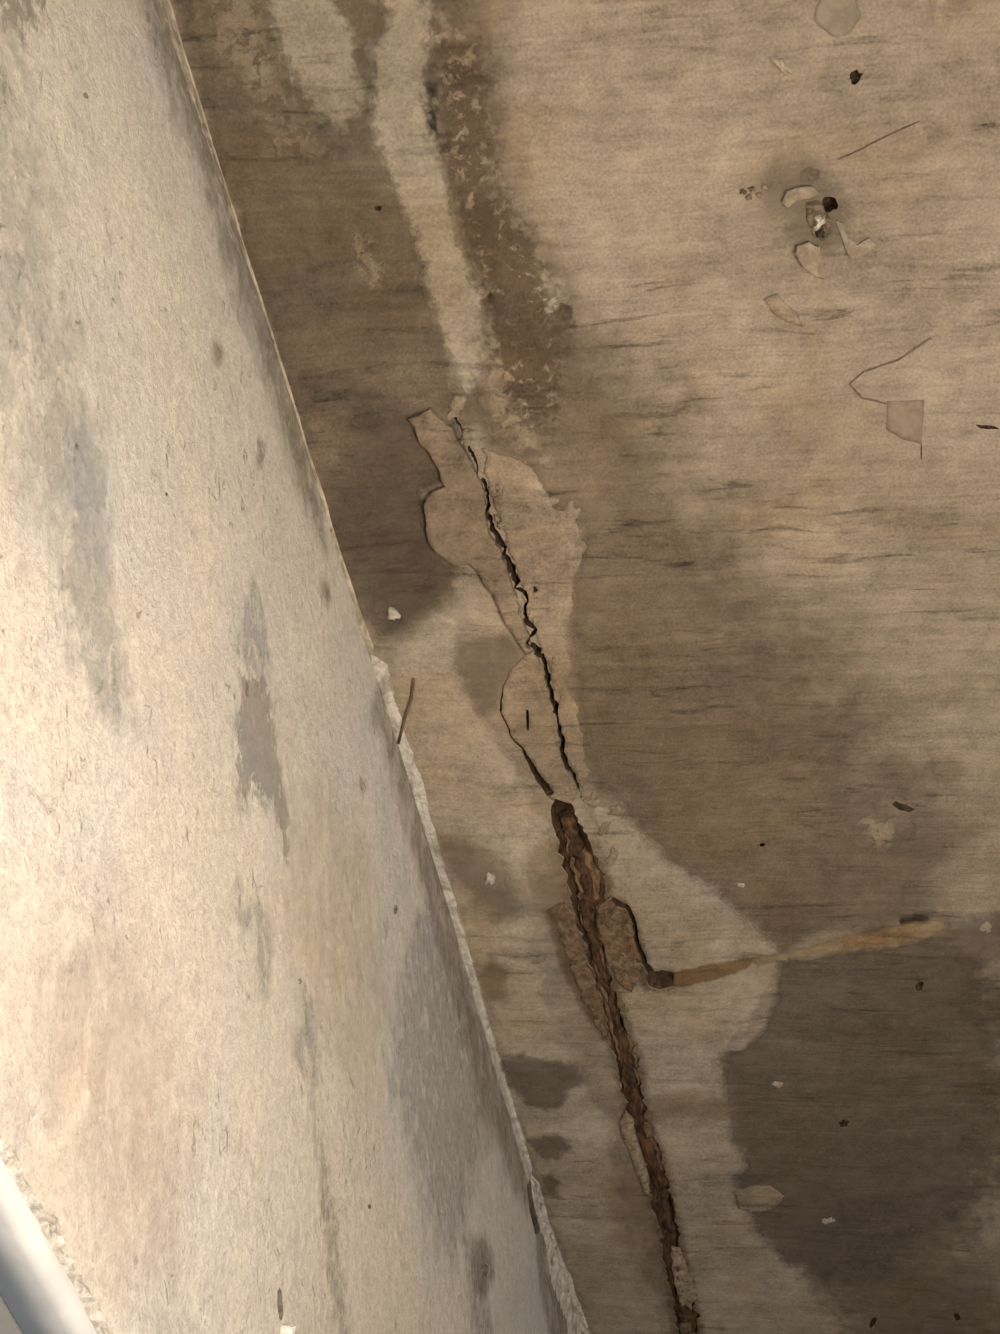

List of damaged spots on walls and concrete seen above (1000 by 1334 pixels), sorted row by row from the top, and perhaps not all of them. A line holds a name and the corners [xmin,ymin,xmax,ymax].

peeling [813,215,826,238]
spalling [387,607,401,620]
crack [454,417,580,796]
damp [177,0,935,1334]
spalling [408,393,701,1334]
crack [612,896,674,990]
damp [592,806,1000,1334]